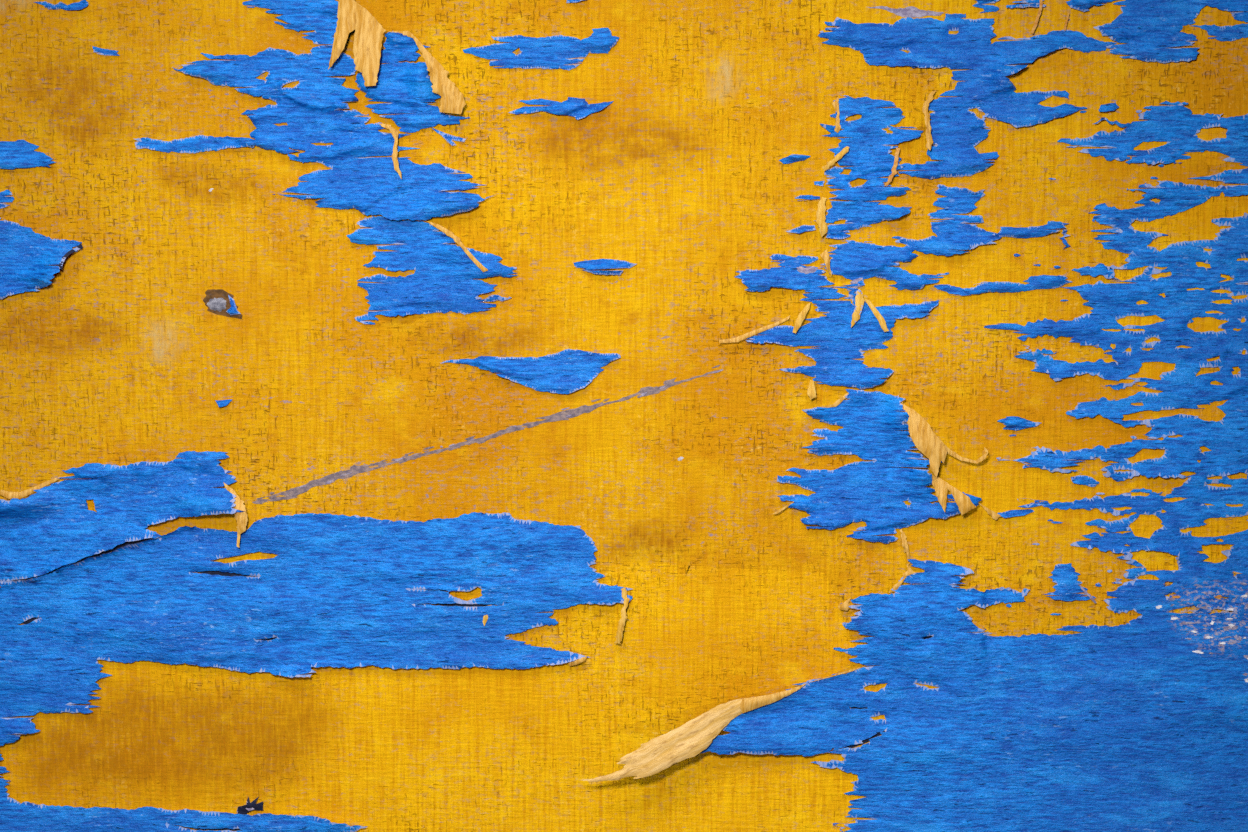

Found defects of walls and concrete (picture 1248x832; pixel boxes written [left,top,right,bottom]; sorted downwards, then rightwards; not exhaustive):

peeling [463,28,619,70]
peeling [509,97,613,120]
peeling [0,140,56,169]
peeling [133,0,517,324]
peeling [0,190,83,299]
peeling [719,0,1248,553]
peeling [442,349,621,394]
peeling [1071,293,1248,682]
crack [19,538,154,580]
peeling [1045,563,1123,615]
crack [22,616,41,624]
peeling [0,561,866,832]